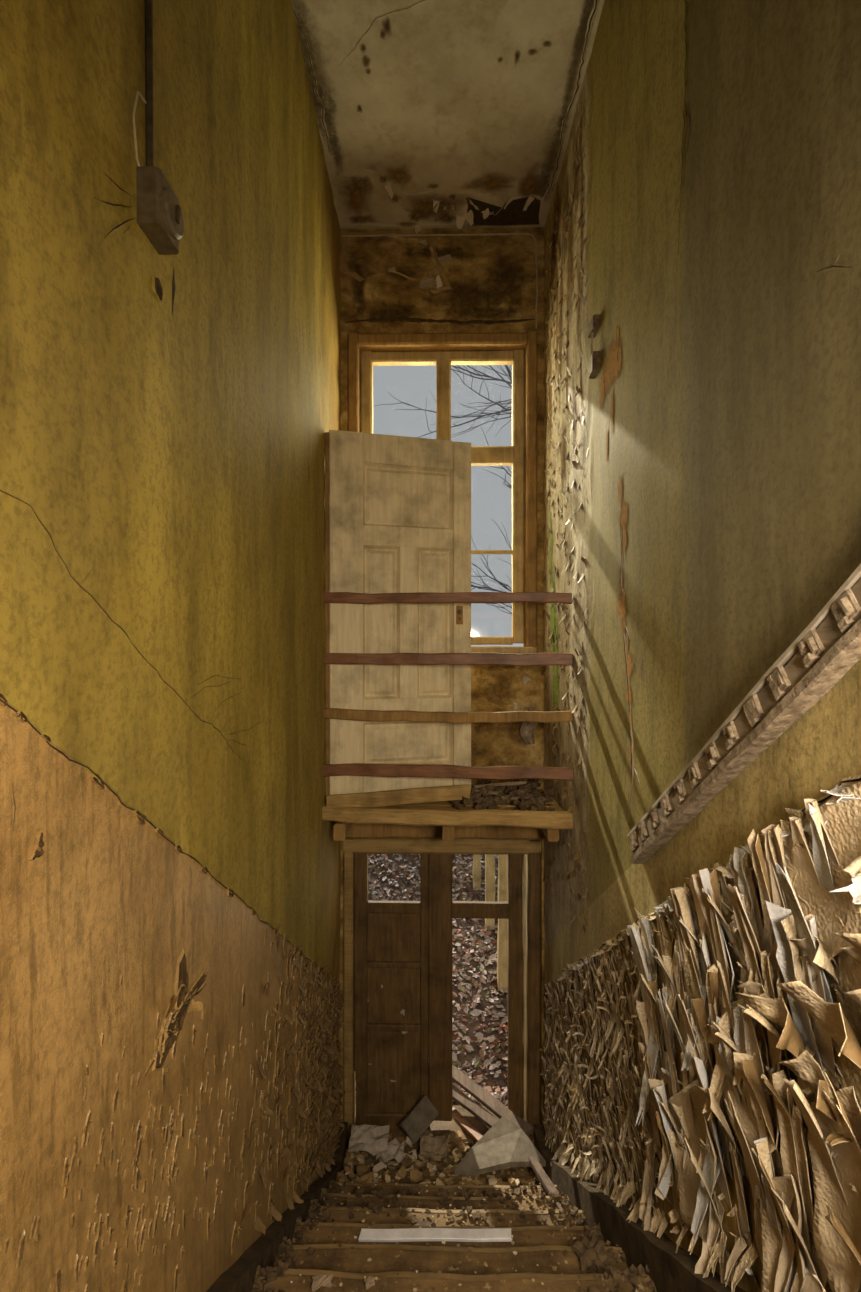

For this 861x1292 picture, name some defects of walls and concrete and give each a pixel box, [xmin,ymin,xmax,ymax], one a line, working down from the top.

crack [340,0,427,66]
leakage [354,264,413,323]
crack [0,488,264,765]
peeling [0,693,346,1292]
peeling [539,774,861,1292]